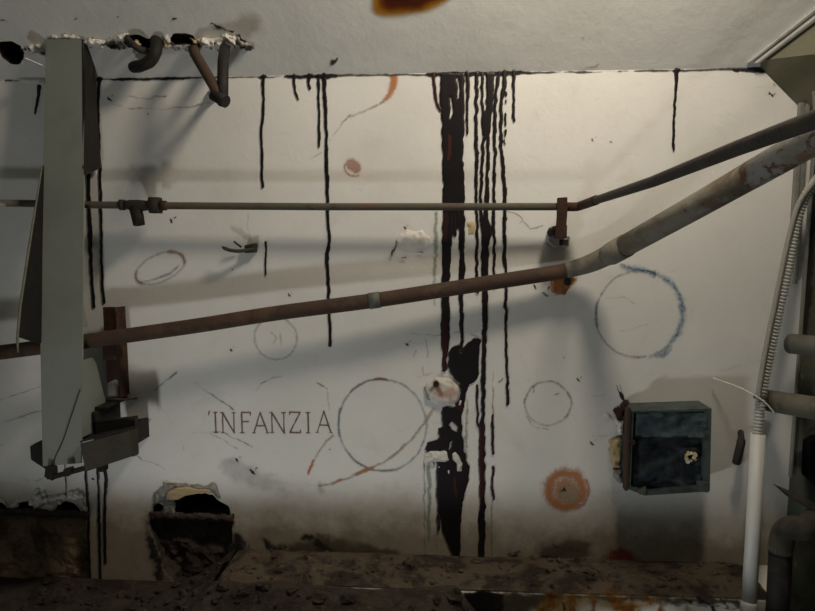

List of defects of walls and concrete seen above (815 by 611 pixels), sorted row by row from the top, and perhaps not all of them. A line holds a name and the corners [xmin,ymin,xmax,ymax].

spalling [0,41,45,70]
spalling [50,33,150,50]
spalling [162,23,254,52]
crack [103,70,592,81]
crack [618,66,765,74]
leakage [307,73,331,299]
leakage [432,69,516,284]
spalling [424,377,461,405]
leakage [425,291,495,557]
spalling [0,488,89,579]
spalling [146,479,246,581]
corrosion [510,589,740,611]